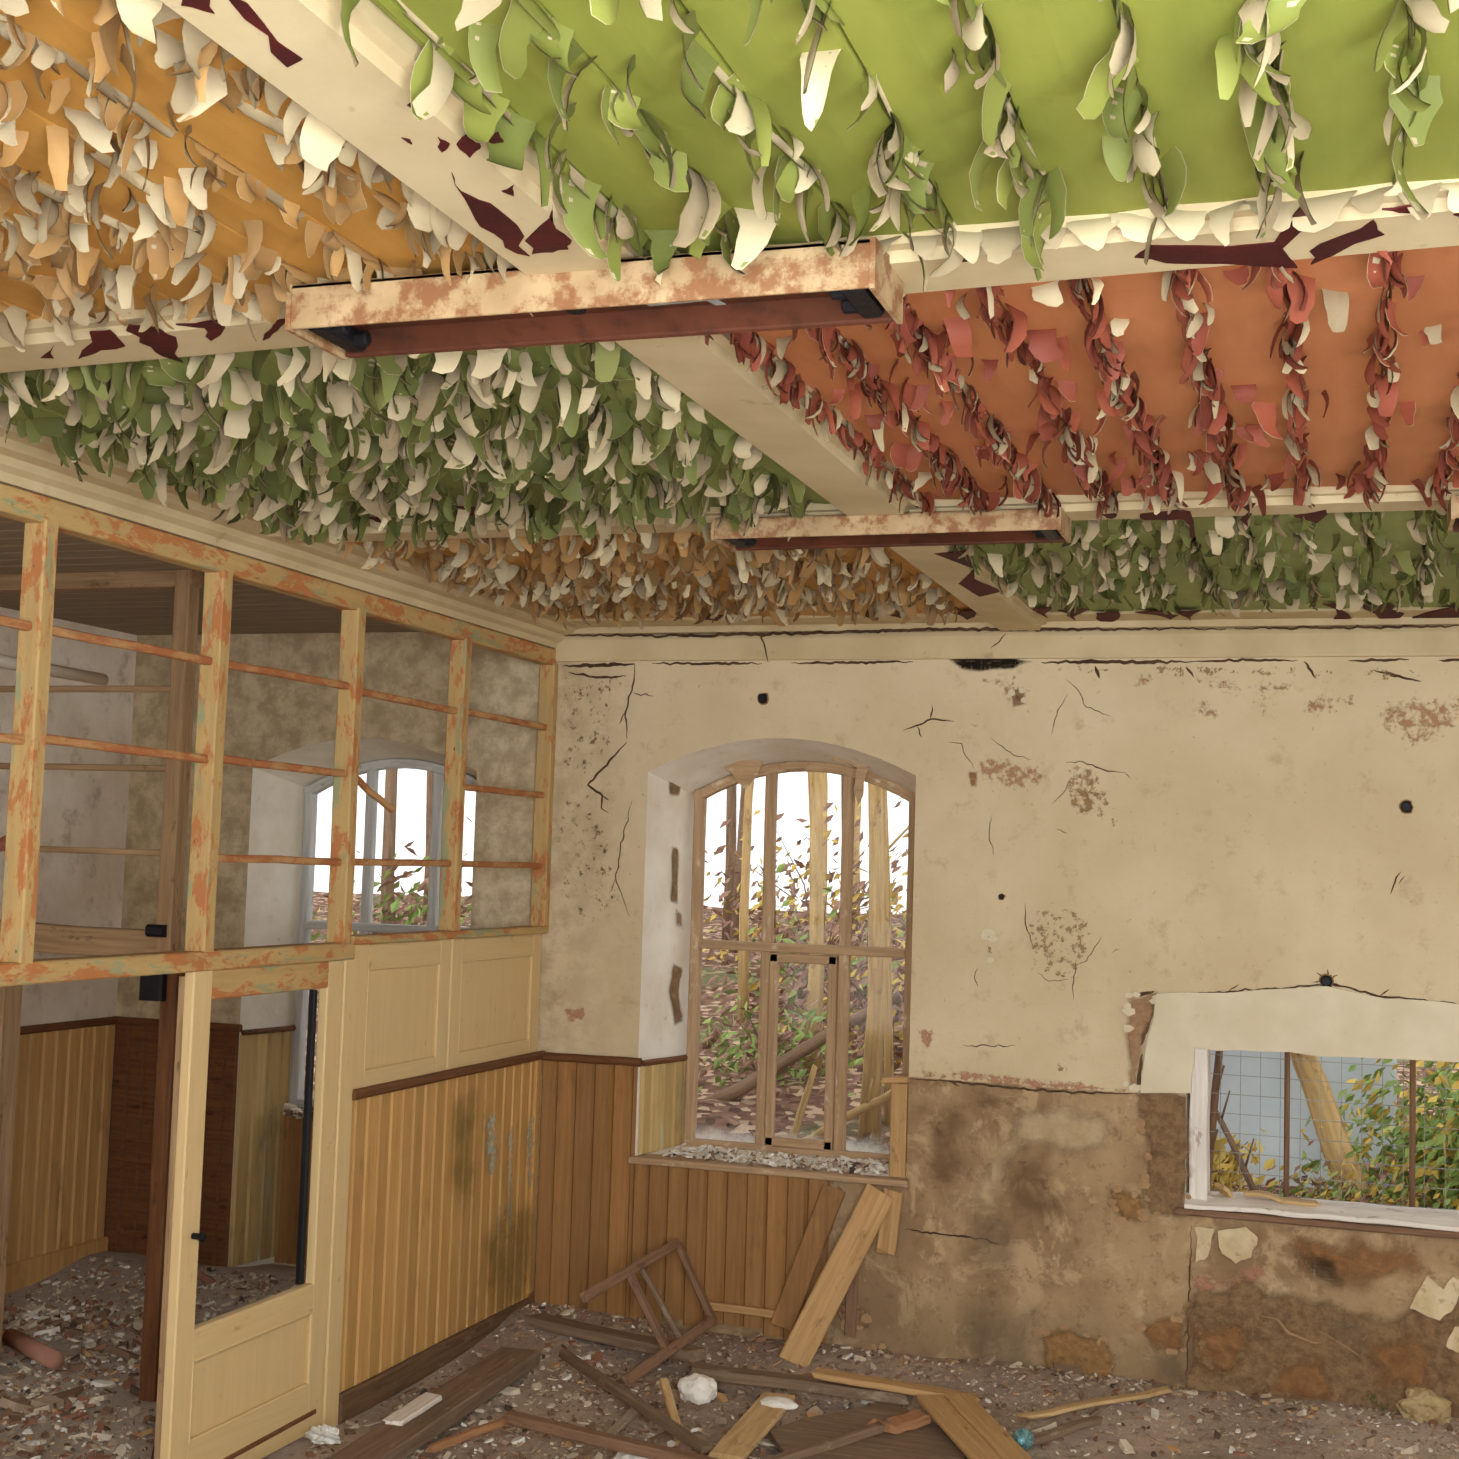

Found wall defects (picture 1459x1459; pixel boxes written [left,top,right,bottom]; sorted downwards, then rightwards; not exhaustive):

peeling [0,0,1459,630]
crack [564,625,1459,917]
spalling [1108,992,1192,1224]
crack [1200,984,1453,1003]
spalling [1035,1324,1114,1377]
spalling [1133,1226,1459,1418]